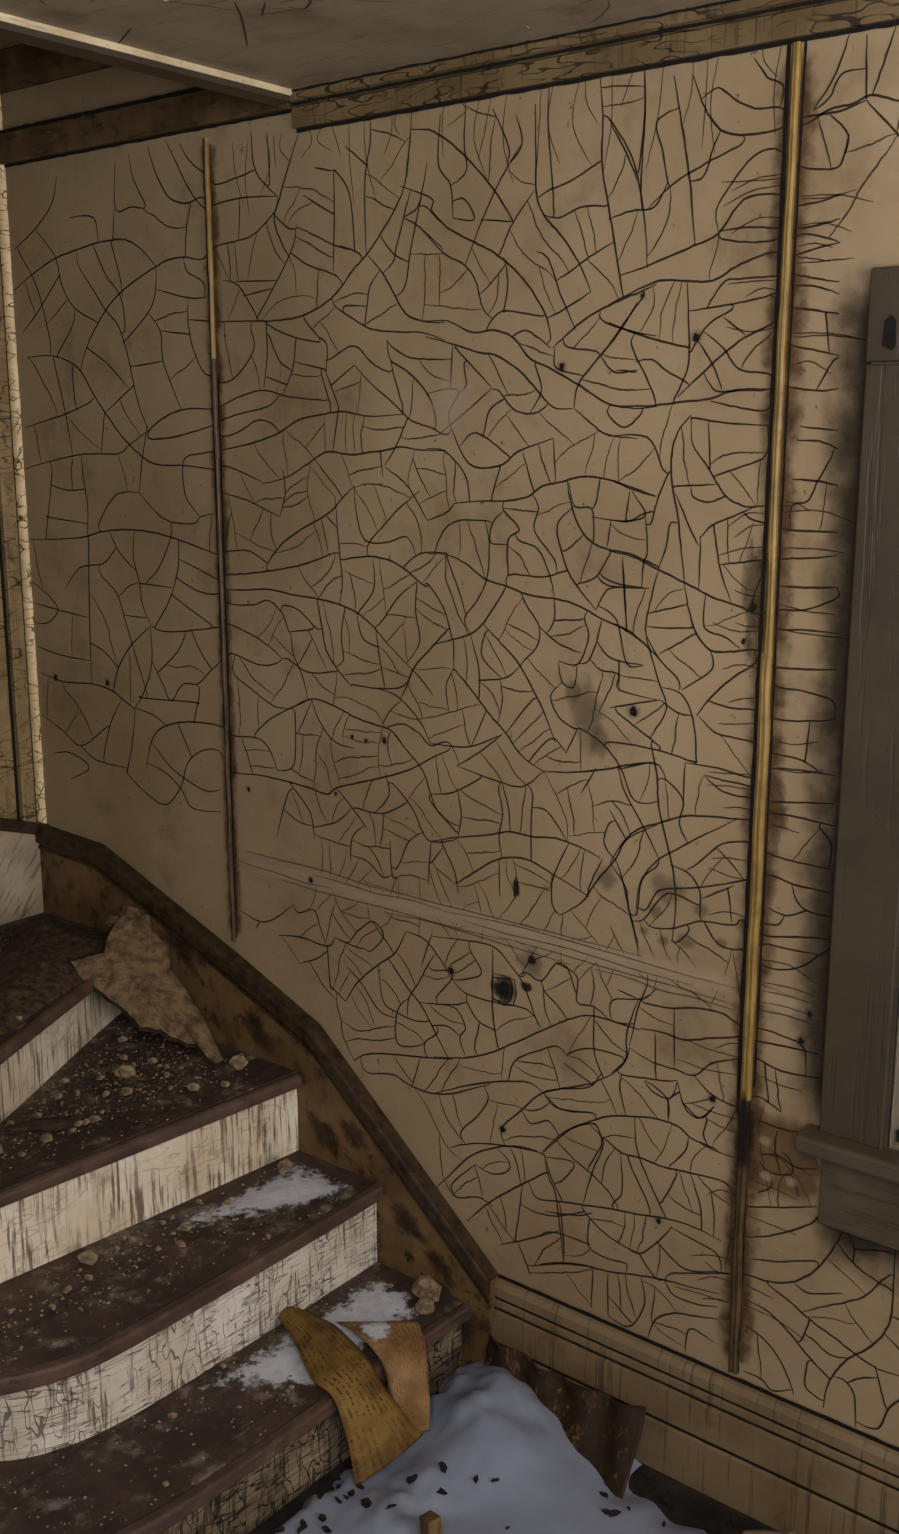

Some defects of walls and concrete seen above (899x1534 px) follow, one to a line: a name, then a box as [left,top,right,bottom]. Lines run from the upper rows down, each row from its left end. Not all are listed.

crack [234,0,312,46]
crack [789,190,874,392]
crack [13,46,785,956]
crack [784,426,842,560]
crack [781,586,837,638]
crack [772,667,833,776]
crack [772,801,831,833]
crack [757,856,820,1112]